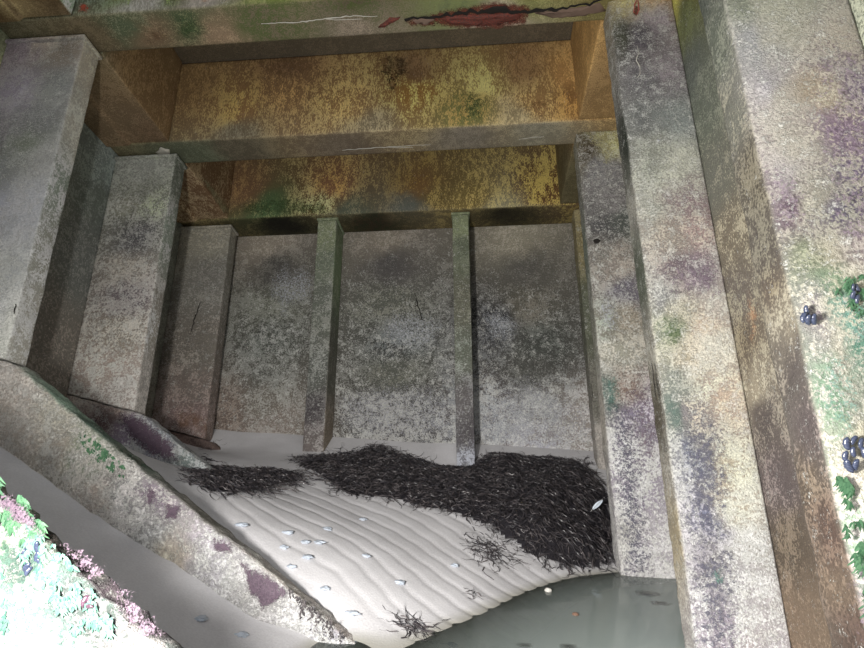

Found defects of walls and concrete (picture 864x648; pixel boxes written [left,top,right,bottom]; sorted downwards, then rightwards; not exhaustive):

crack [261,0,606,30]